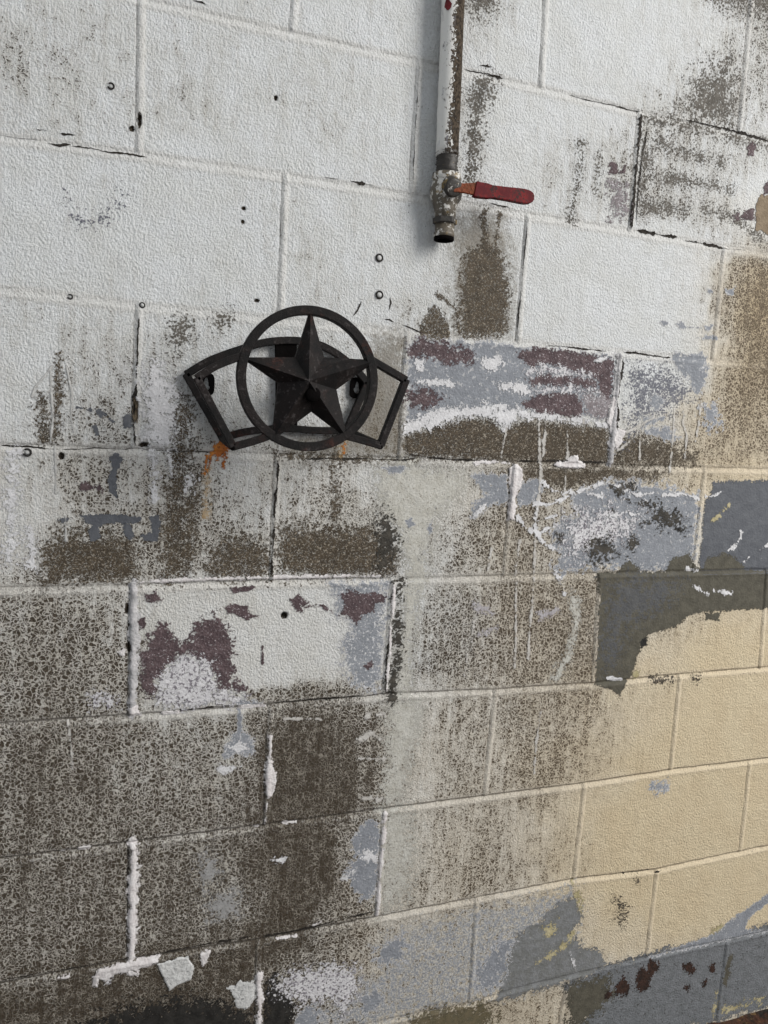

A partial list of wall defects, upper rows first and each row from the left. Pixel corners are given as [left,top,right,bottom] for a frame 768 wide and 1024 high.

damp [419,64,513,343]
damp [631,37,768,246]
peeling [401,319,728,452]
rust [202,441,230,519]
peeling [117,585,273,776]
damp [0,302,706,924]
peeling [468,459,768,698]
peeling [157,949,211,991]
damp [71,971,300,1024]
peeling [267,878,768,1024]
rust [604,958,660,1001]
rust [682,962,715,991]